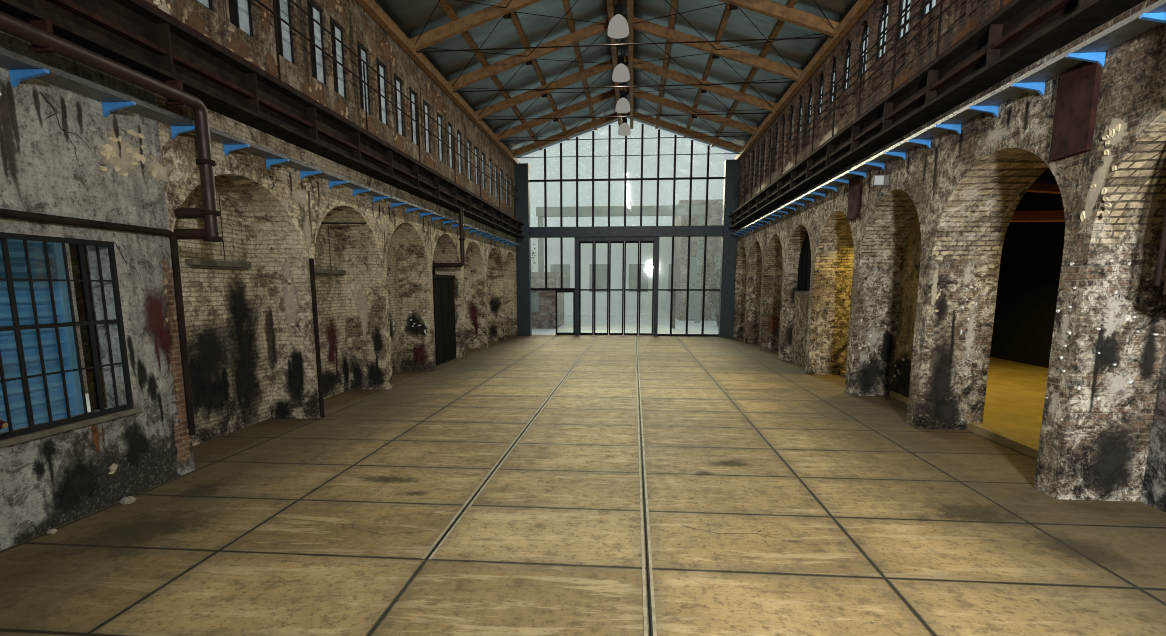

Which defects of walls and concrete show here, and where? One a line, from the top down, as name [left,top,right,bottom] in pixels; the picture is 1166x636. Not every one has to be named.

water stain [1077,280,1158,414]
water stain [34,439,97,509]
water stain [126,425,148,469]